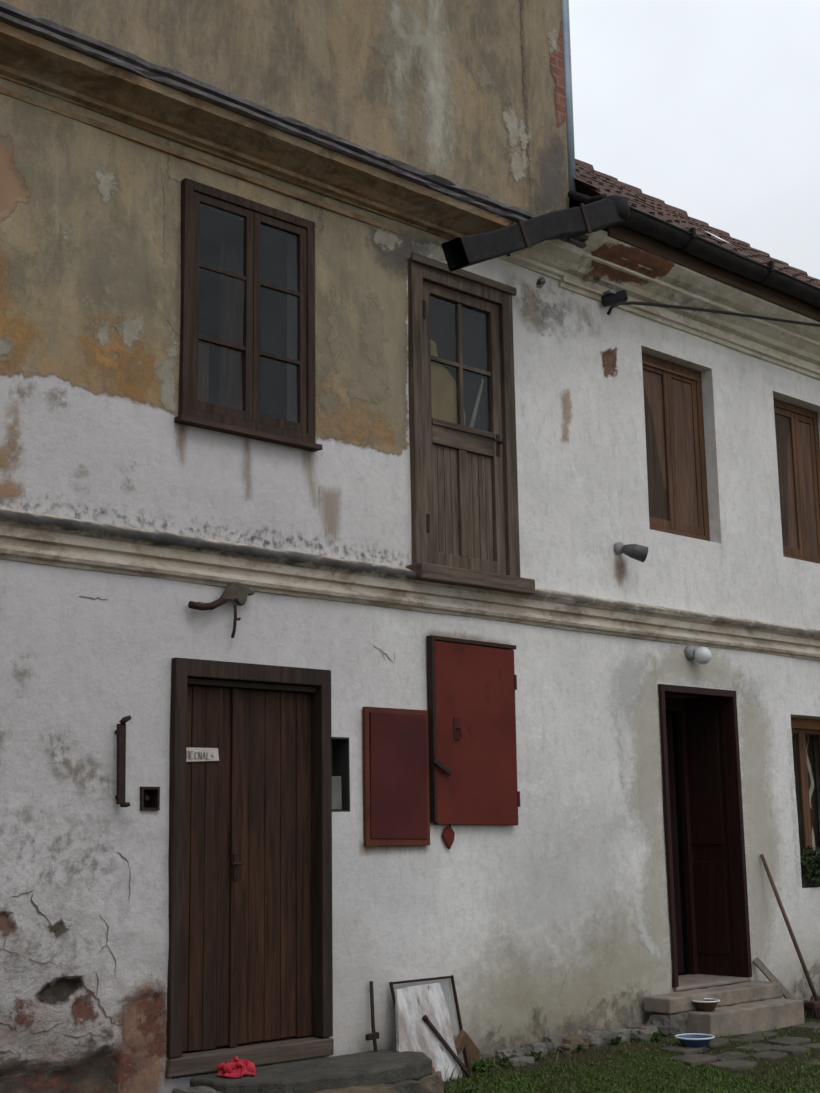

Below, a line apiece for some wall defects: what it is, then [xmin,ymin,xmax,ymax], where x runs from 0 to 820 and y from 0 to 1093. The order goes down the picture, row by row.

leakage [391,0,452,166]
spalling [548,22,566,127]
peeling [502,108,531,182]
peeling [0,78,450,456]
spalling [583,241,675,285]
spalling [602,347,618,376]
spalling [0,911,18,949]
crack [12,890,51,923]
crack [0,916,124,1054]
spalling [0,974,168,1093]